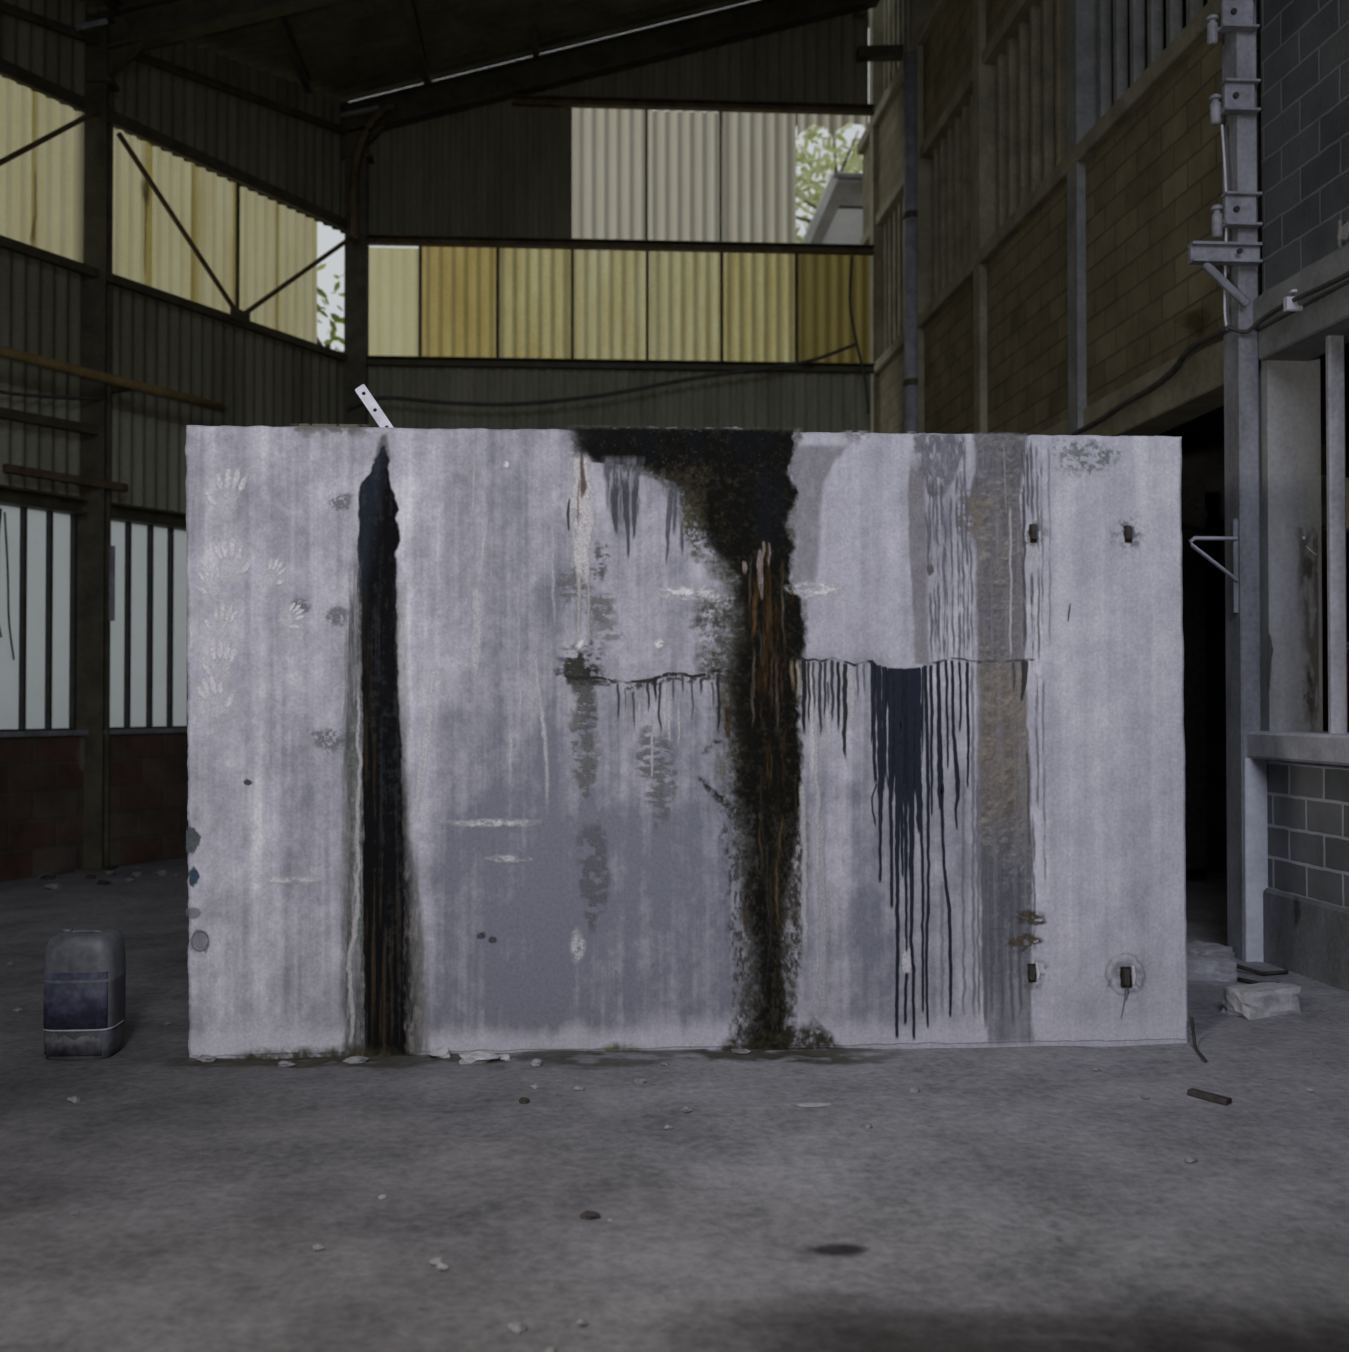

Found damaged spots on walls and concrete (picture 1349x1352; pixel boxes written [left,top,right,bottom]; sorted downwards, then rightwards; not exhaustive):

leakage [344,444,436,1056]
leakage [537,681,548,789]
leakage [556,426,865,1050]
rust [744,542,794,721]
leakage [909,434,973,662]
leakage [962,445,1051,1019]
leakage [902,947,912,974]